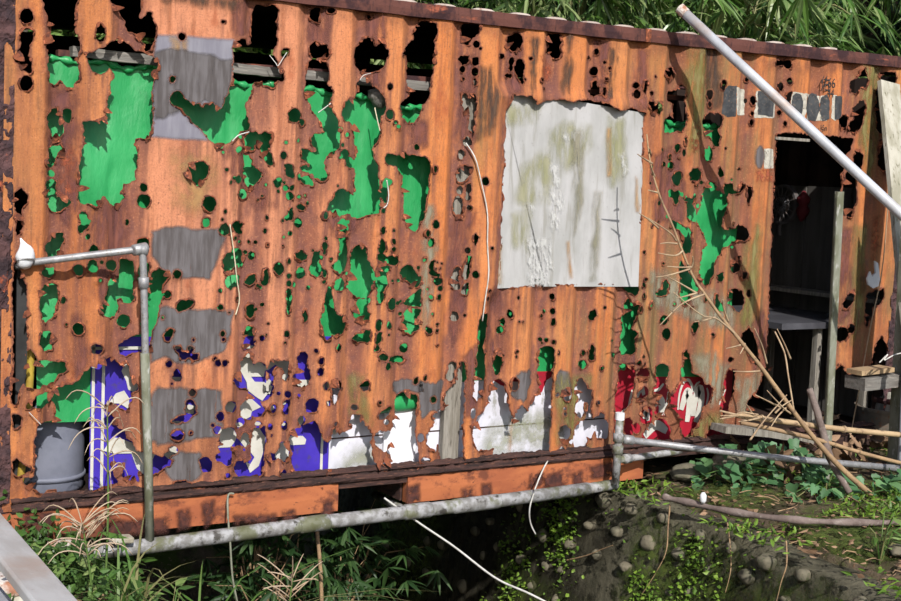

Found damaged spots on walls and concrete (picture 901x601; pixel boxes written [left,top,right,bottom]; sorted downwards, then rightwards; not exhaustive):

rust [499,32,561,110]
rust [560,40,673,119]
rust [44,71,141,339]
rust [180,160,256,257]
rust [221,7,475,368]
rust [599,81,807,323]
rust [200,358,352,478]
peeling [288,364,305,390]
rust [415,244,541,464]
peeling [636,398,683,440]
rust [463,484,491,498]
rust [529,461,613,487]